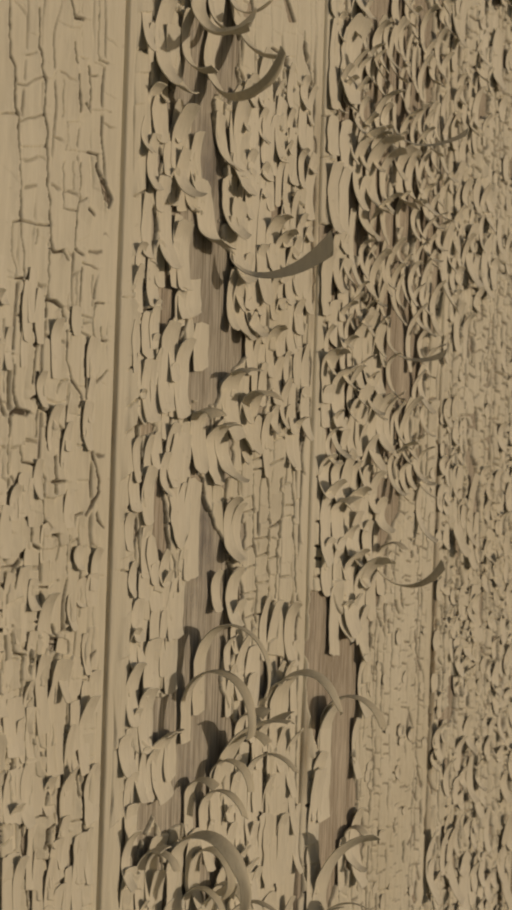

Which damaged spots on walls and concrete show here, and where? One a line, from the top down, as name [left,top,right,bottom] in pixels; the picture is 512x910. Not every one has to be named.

crack [75,152,110,214]
crack [0,297,60,424]
crack [75,452,102,527]
peeling [118,0,512,910]
crack [0,516,55,630]
peeling [0,255,104,910]
crack [13,628,57,666]